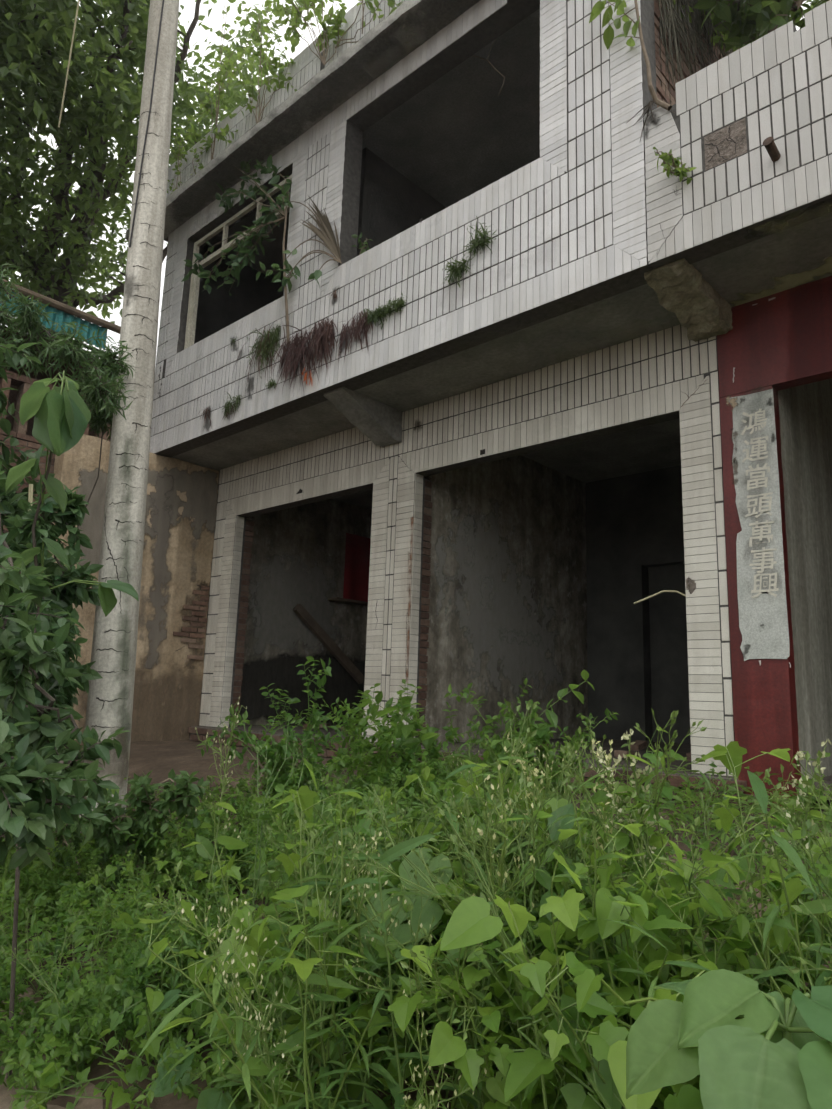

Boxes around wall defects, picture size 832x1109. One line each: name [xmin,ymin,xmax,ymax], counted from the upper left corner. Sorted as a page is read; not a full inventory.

crack [91,111,161,728]
peeling [76,468,108,566]
peeling [143,467,218,549]
flaking render [173,581,210,666]